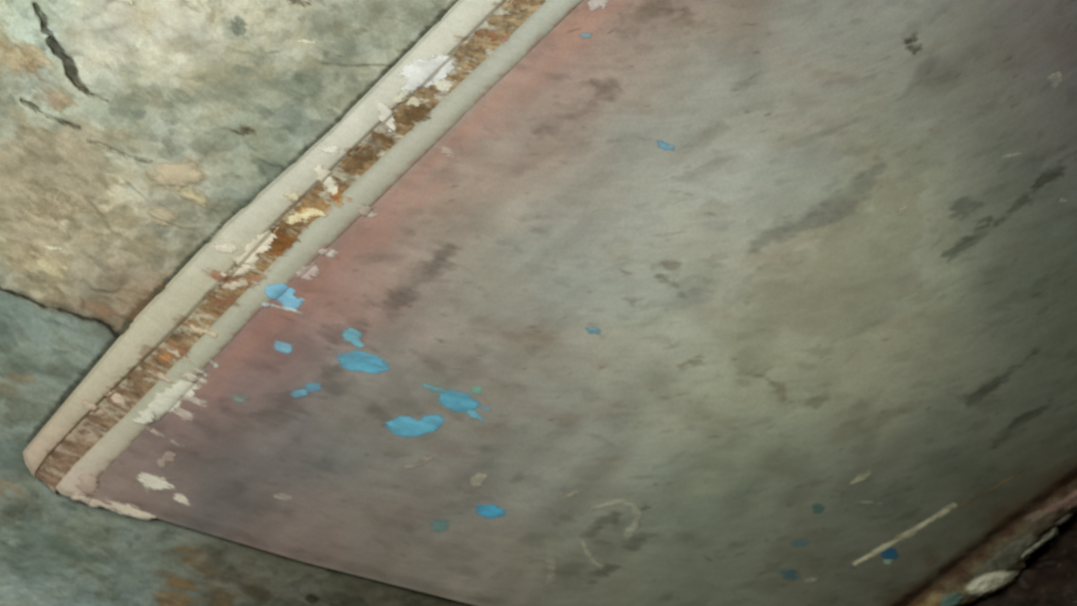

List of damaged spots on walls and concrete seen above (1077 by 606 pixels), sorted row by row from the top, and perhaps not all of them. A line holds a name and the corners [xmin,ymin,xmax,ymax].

peeling [588,0,610,11]
spalling [231,17,246,34]
flaking render [0,39,51,73]
crack [33,3,107,101]
peeling [376,53,455,132]
crack [20,99,80,129]
peeling [314,143,339,195]
peeling [283,193,326,224]
peeling [214,230,277,290]
peeling [295,248,338,280]
peeling [0,288,475,606]